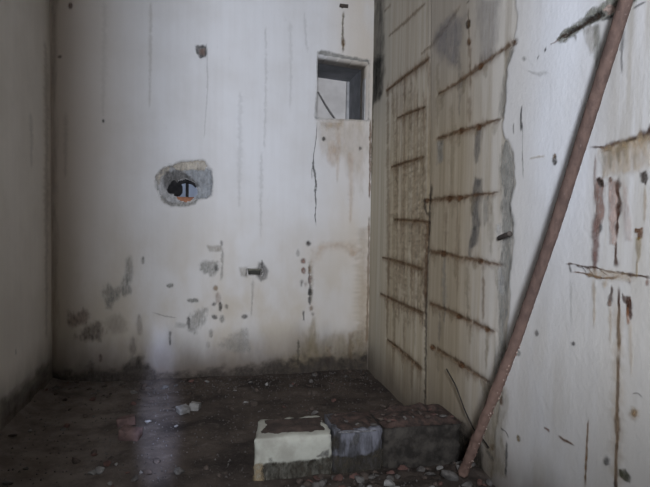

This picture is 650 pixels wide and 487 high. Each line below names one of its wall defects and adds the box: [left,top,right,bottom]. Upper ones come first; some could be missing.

spalling [557,0,618,42]
corrosion [595,127,650,150]
spalling [156,161,213,206]
crack [310,128,318,221]
damp [53,357,179,382]
damp [197,355,368,378]
corrosion [604,359,630,487]